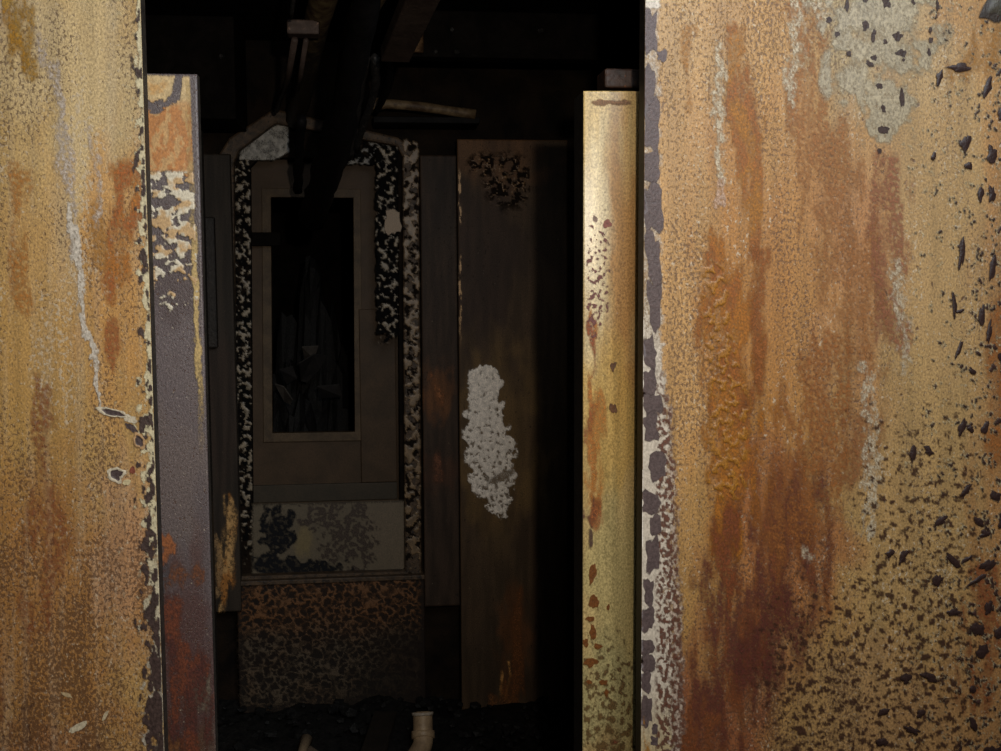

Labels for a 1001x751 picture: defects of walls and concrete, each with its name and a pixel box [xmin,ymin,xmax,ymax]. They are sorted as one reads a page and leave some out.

corrosion [1,0,37,81]
peeling [783,0,952,154]
corrosion [91,162,142,306]
peeling [96,0,203,751]
corrosion [583,376,606,547]
corrosion [586,215,613,357]
spalling [641,0,675,751]
corrosion [695,24,781,611]
corrosion [786,0,912,377]
peeling [858,361,882,541]
peeling [889,260,910,374]
corrosion [584,630,644,751]